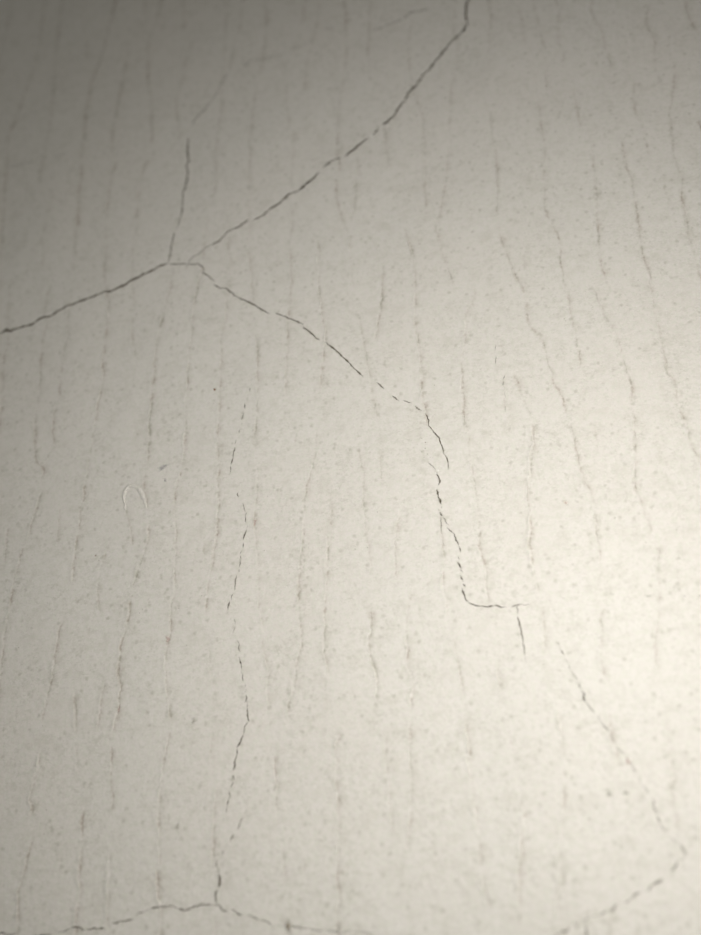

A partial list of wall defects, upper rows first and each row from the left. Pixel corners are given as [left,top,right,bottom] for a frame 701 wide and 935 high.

crack [2,0,528,653]
crack [153,863,270,924]